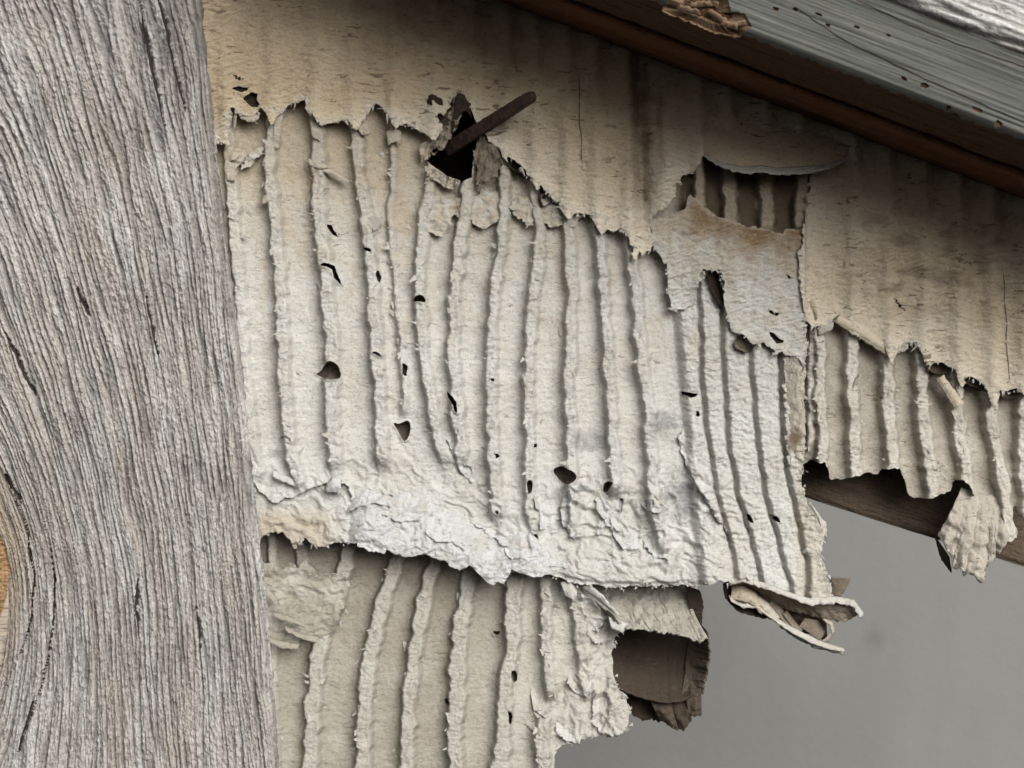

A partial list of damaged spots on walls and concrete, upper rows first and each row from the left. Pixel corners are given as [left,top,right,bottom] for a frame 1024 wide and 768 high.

peeling [232,110,261,130]
peeling [386,127,401,145]
peeling [703,123,848,176]
peeling [781,297,909,466]
peeling [921,353,963,408]
peeling [250,441,394,503]
peeling [678,429,737,539]
peeling [809,501,827,538]
peeling [935,488,1009,583]
peeling [264,561,348,650]
peeling [560,580,709,644]
peeling [723,548,864,655]